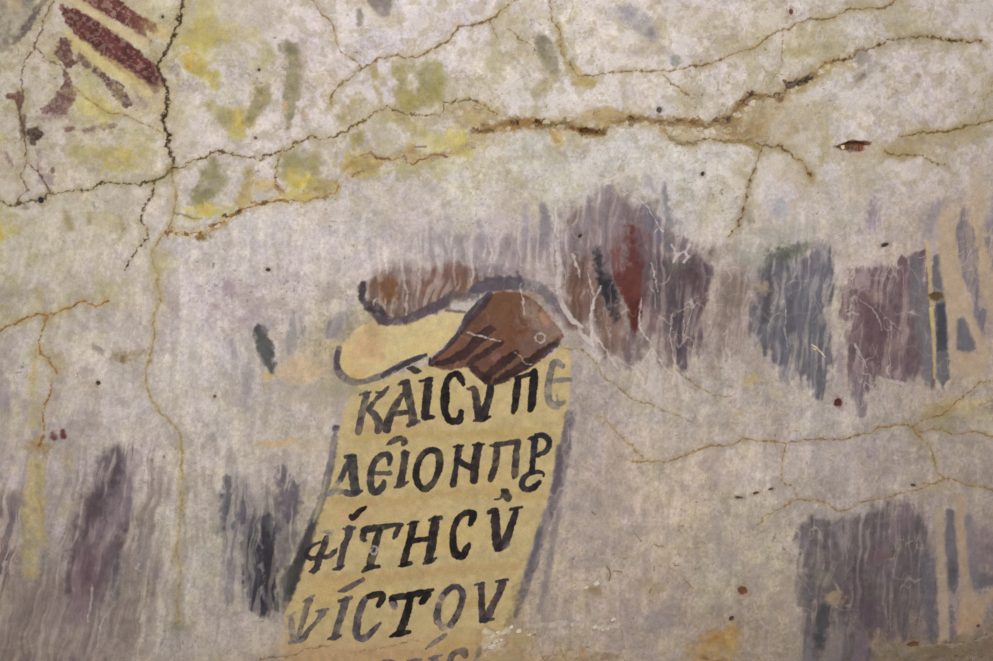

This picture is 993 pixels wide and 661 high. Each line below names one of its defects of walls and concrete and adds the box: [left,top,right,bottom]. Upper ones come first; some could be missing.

spalling [159,41,875,243]
crack [306,0,993,240]
spalling [813,140,894,168]
crack [0,0,539,629]
crack [528,310,993,528]